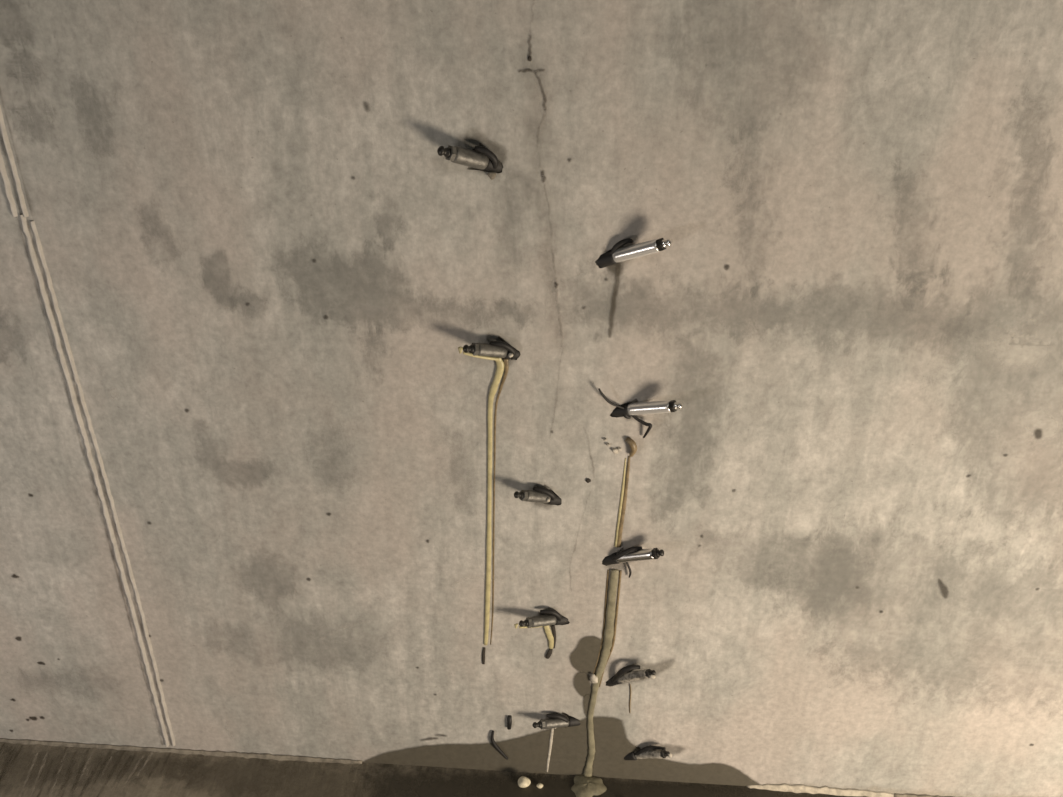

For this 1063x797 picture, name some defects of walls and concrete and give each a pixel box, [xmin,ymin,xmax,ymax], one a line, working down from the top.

crack [519,46,546,110]
leakage [609,263,621,335]
leakage [363,569,860,797]